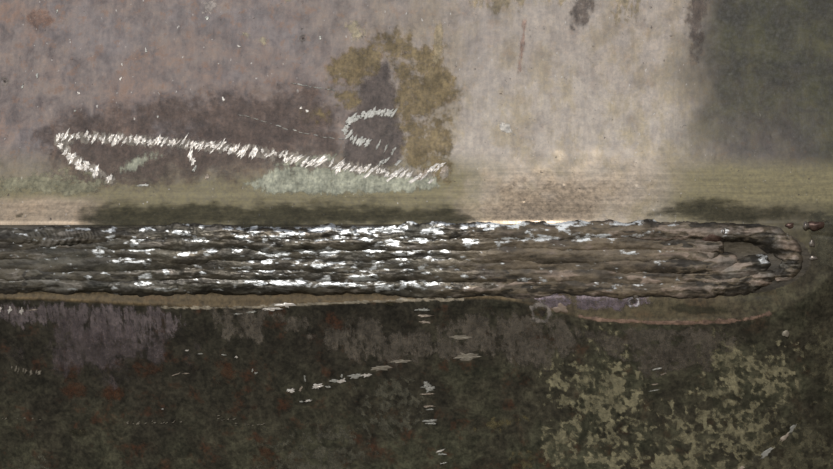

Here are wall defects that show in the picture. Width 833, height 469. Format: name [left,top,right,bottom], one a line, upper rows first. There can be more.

water stain [38,64,405,188]
water stain [540,320,833,469]